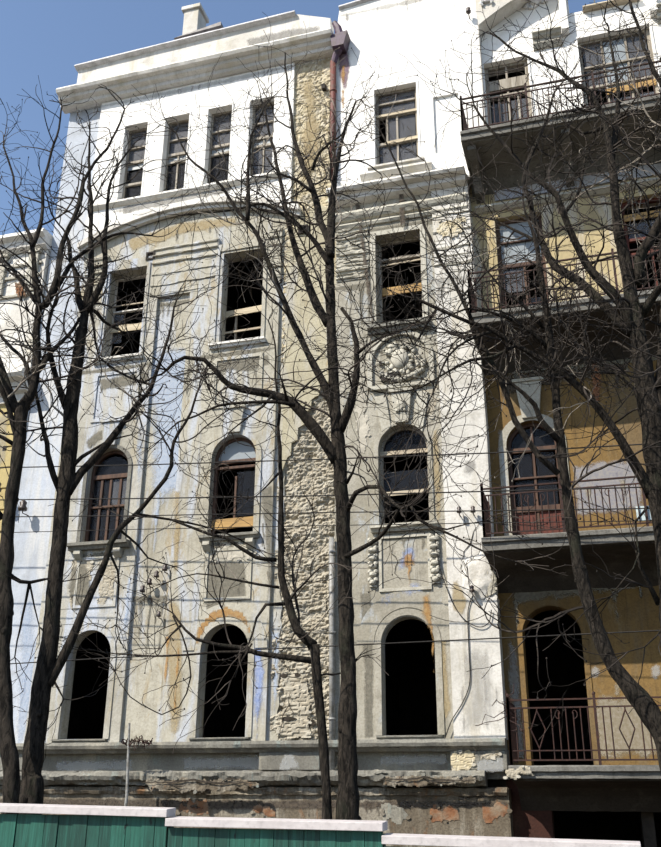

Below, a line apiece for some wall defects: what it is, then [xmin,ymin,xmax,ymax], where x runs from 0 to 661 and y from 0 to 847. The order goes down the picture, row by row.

rust [339,53,349,105]
leakage [82,339,198,525]
peeling [575,461,641,515]
spalling [276,670,316,739]
spalling [379,750,502,788]
spalling [503,765,534,780]
spalling [146,776,260,815]
peeling [250,804,276,817]
peeling [380,803,411,824]
peeling [429,804,459,823]
peeling [482,801,512,823]